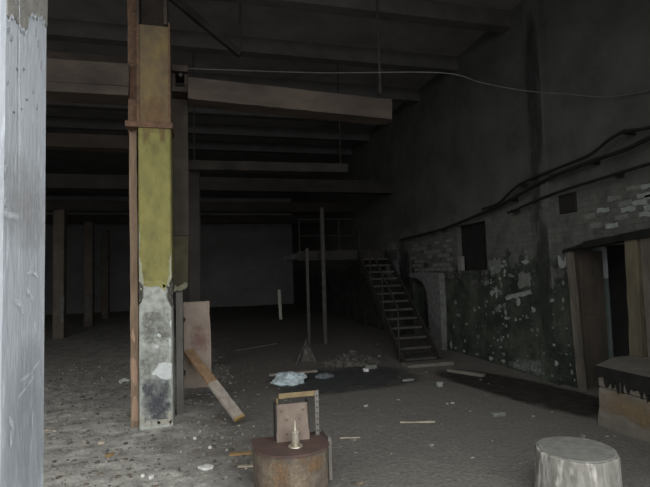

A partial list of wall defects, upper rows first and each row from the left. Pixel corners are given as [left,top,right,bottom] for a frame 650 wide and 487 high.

peeling [7,0,48,47]
flaking render [583,183,650,229]
flaking render [473,250,536,363]
flaking render [152,363,172,380]
spalling [140,412,173,427]